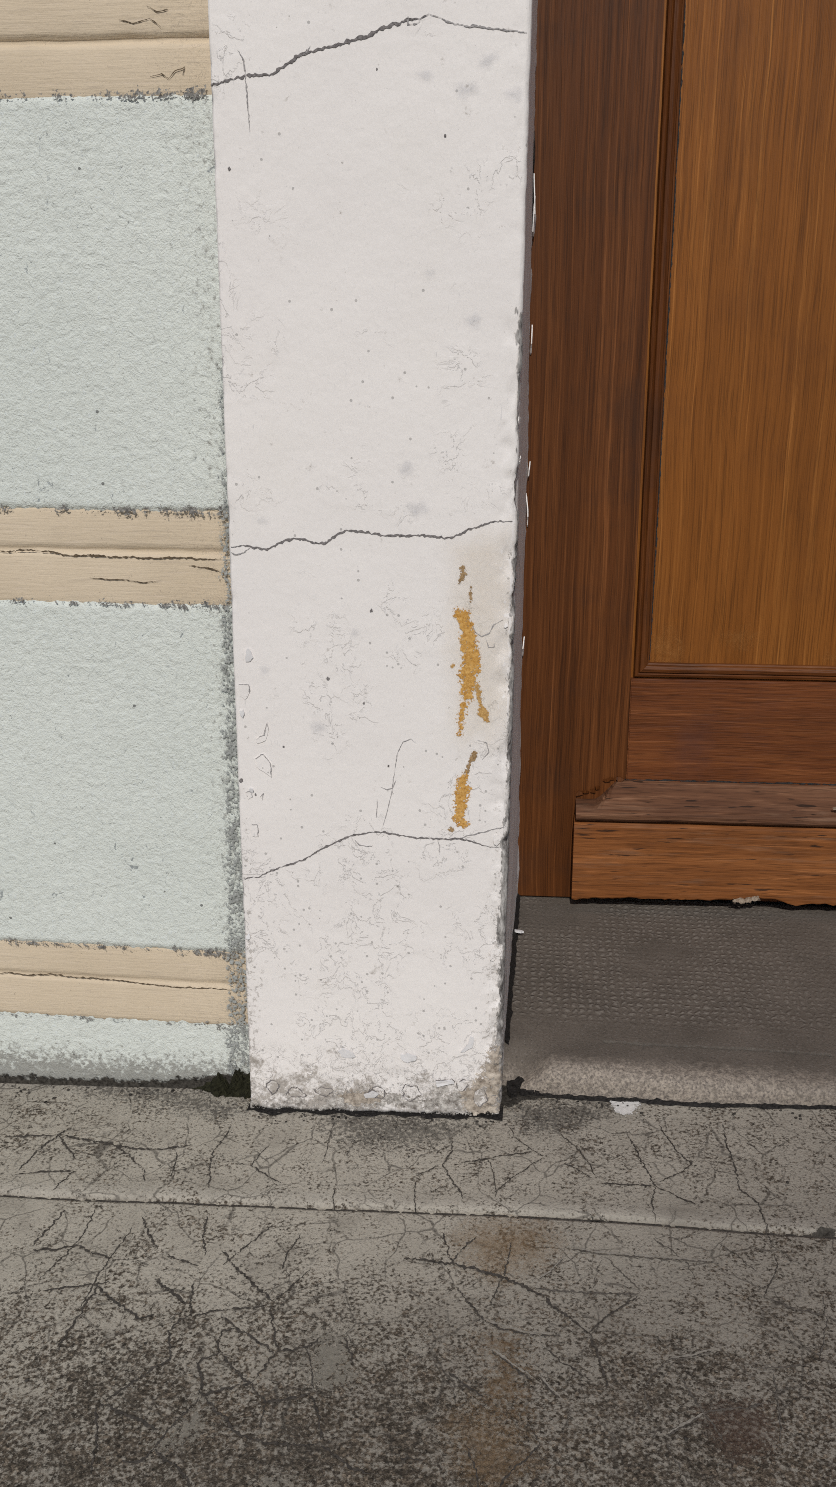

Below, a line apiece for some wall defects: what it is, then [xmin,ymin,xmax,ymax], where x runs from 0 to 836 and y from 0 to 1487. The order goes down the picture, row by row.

crack [150,13,527,130]
crack [1,520,521,583]
corrosion [450,565,490,736]
crack [244,739,515,993]
corrosion [448,751,478,832]
crack [6,1124,424,1487]
crack [404,1124,836,1487]